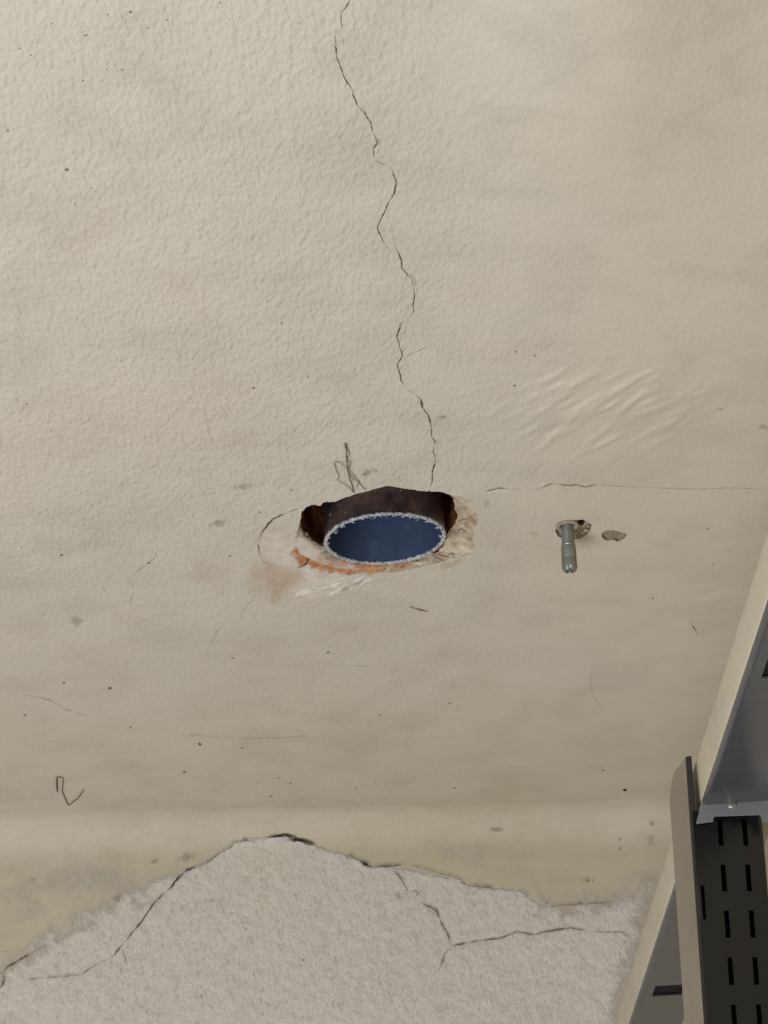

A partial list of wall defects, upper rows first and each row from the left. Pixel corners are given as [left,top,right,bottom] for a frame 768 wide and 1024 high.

crack [335,0,439,489]
crack [1,948,94,987]
crack [115,834,314,958]
peeling [0,831,656,1024]
crack [349,855,626,963]